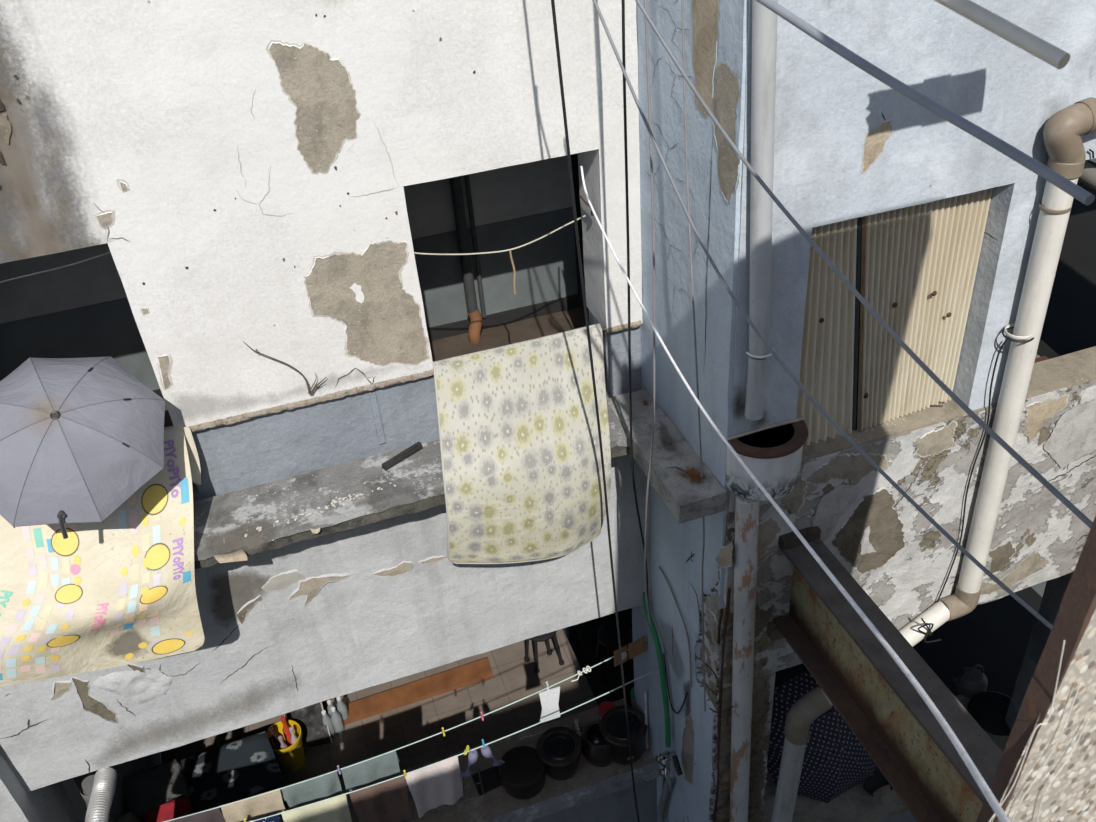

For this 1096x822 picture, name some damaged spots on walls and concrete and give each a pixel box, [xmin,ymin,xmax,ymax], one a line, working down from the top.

damp [0,48,94,264]
peeling [266,40,361,174]
crack [645,0,713,362]
peeling [692,0,740,204]
peeling [282,240,430,366]
crack [335,368,375,387]
peeling [237,569,351,625]
peeling [831,486,906,575]
peeling [980,540,1049,595]
peeling [50,677,119,723]
spalling [694,532,735,822]
spalling [748,618,775,822]